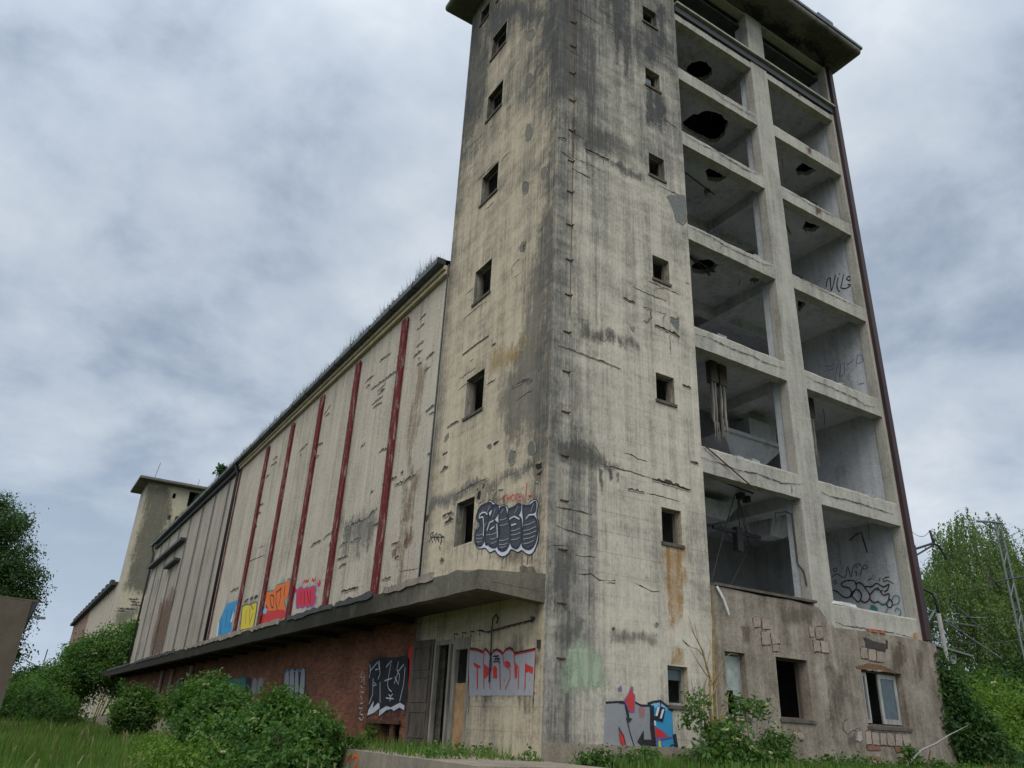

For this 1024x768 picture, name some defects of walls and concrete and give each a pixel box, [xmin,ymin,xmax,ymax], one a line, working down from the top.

leakage [465,0,558,137]
spalling [667,194,687,225]
leakage [558,440,619,486]
crack [601,453,677,501]
leakage [125,484,172,593]
spalling [310,508,378,569]